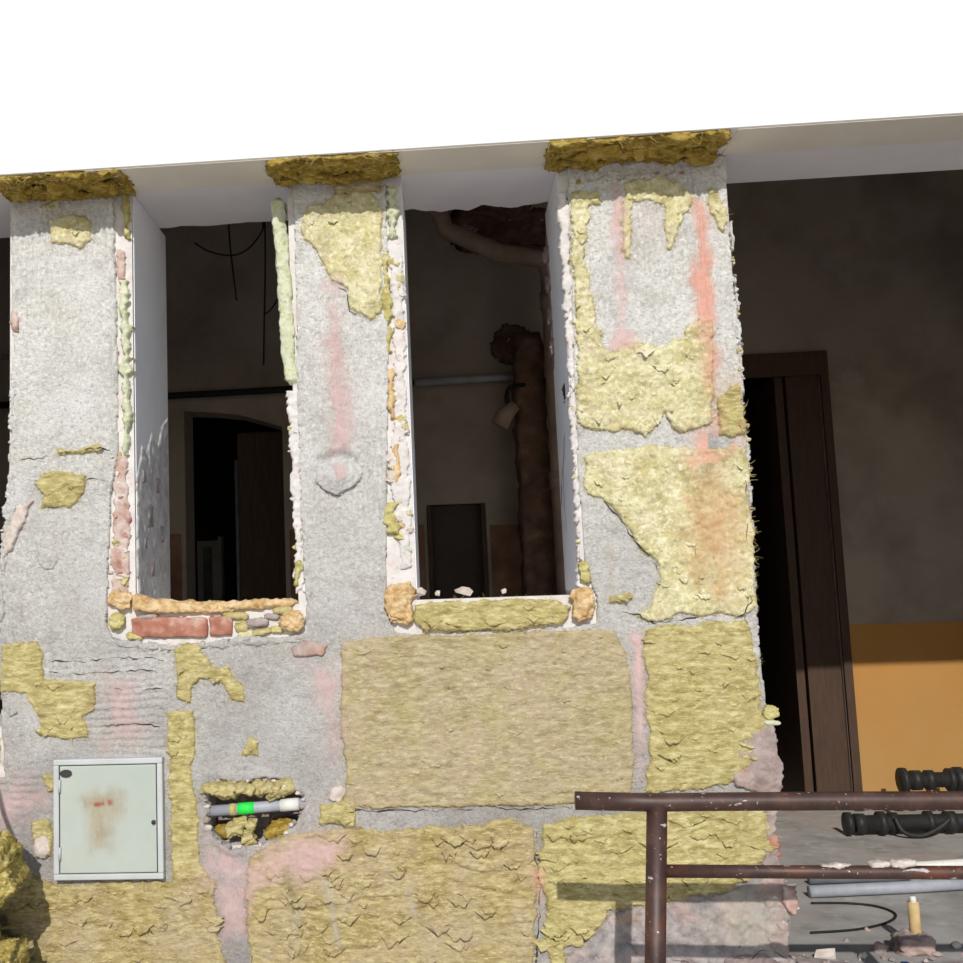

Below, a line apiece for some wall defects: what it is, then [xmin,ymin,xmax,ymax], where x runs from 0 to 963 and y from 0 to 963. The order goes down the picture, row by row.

peeling [679,147,718,167]
spalling [729,221,756,530]
spalling [737,555,759,635]
spalling [733,719,784,792]
spalling [191,777,305,849]
peeling [440,834,511,860]
peeling [547,825,646,854]
peeling [542,854,597,894]
peeling [414,889,498,920]
peeling [337,906,473,952]